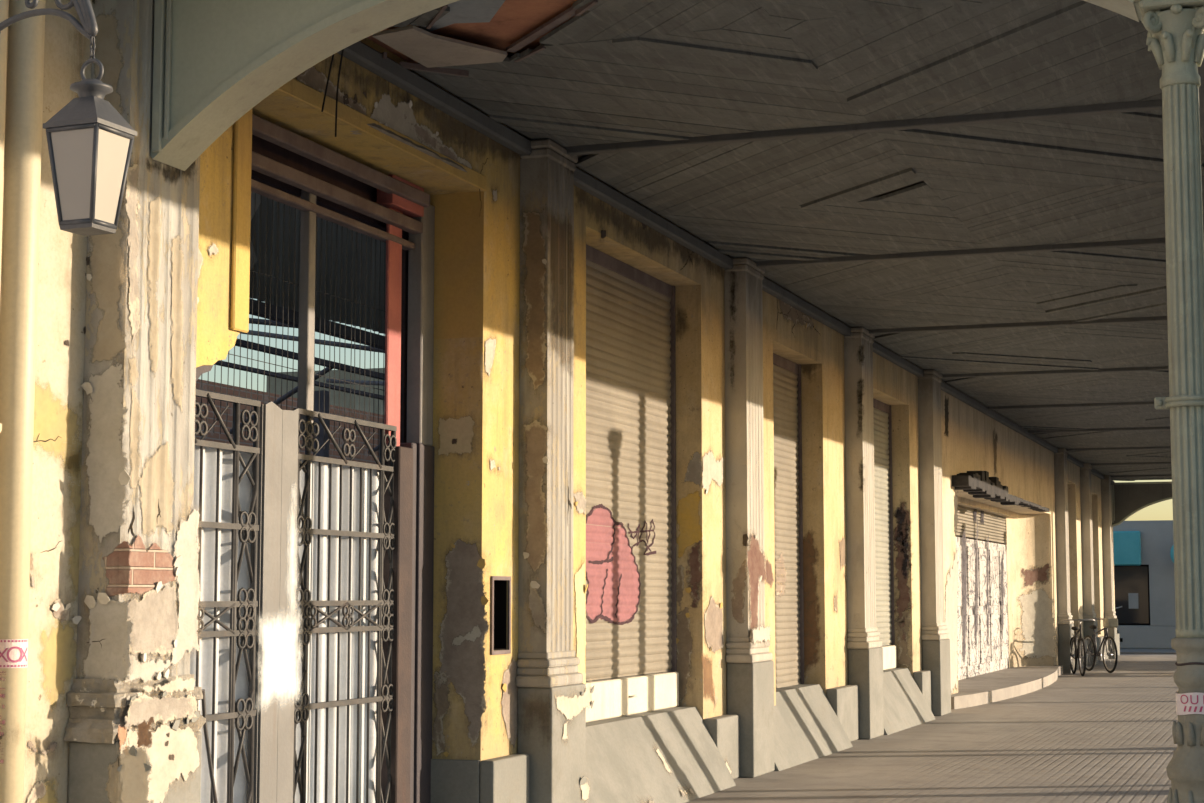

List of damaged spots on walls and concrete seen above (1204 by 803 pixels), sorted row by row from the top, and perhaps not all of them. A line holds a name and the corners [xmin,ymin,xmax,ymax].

flaking render [295,66,472,169]
peeling [33,164,219,707]
peeling [432,539,519,757]
peeling [523,420,548,633]
peeling [555,562,595,740]
peeling [676,451,774,701]
water stain [894,507,912,579]
peeling [1016,588,1057,659]
peeling [106,717,200,803]